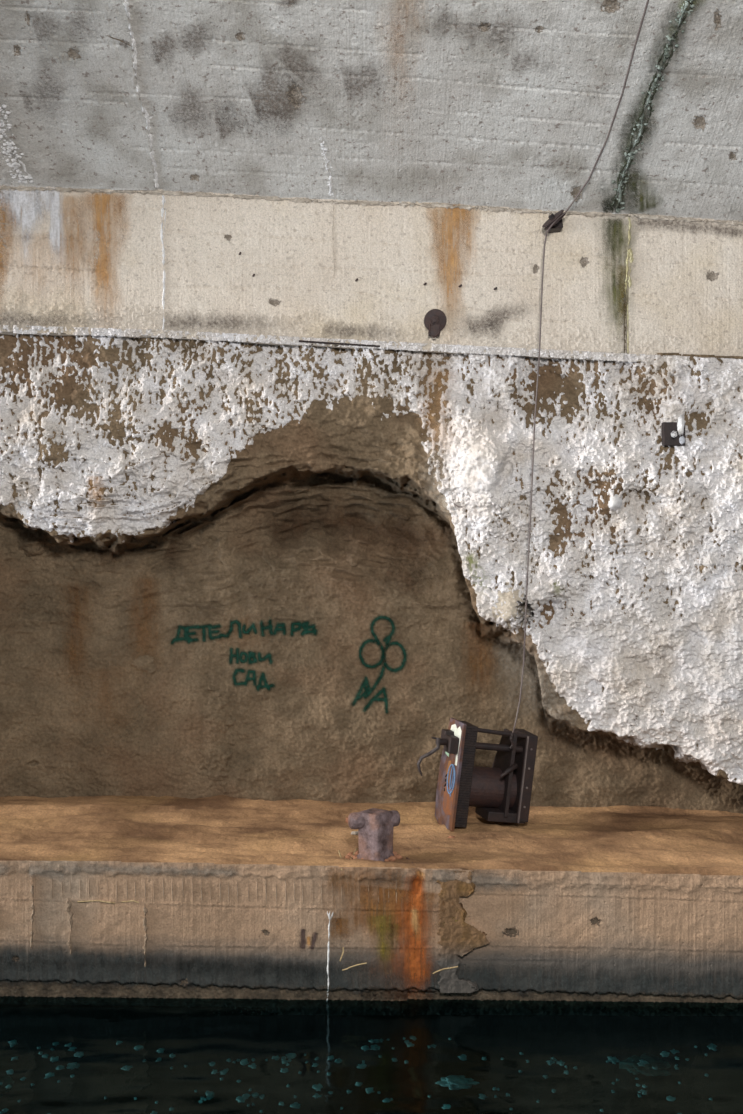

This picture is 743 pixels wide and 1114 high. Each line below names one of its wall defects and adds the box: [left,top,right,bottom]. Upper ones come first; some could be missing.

leakage [603,0,742,240]
rust [92,193,113,287]
rust [442,205,470,297]
leakage [0,310,743,785]
spalling [0,868,743,1003]
rust [406,871,425,984]